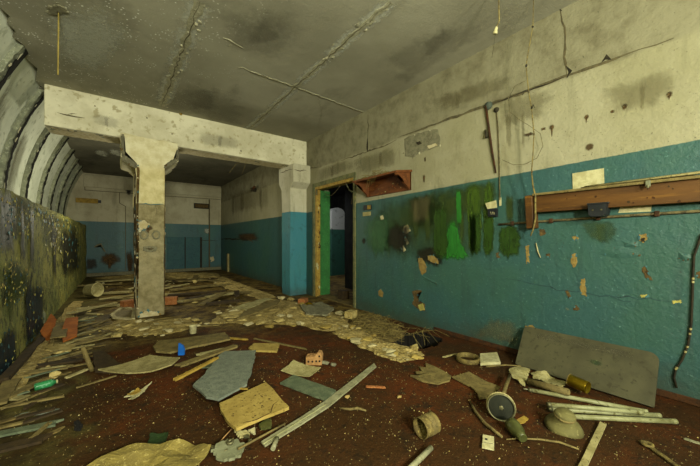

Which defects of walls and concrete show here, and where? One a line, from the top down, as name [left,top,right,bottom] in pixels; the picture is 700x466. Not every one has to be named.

crack [158,0,211,108]
crack [241,1,673,161]
spalling [403,129,441,159]
damp [0,191,34,264]
peeling [412,288,425,311]
peeling [418,254,439,276]